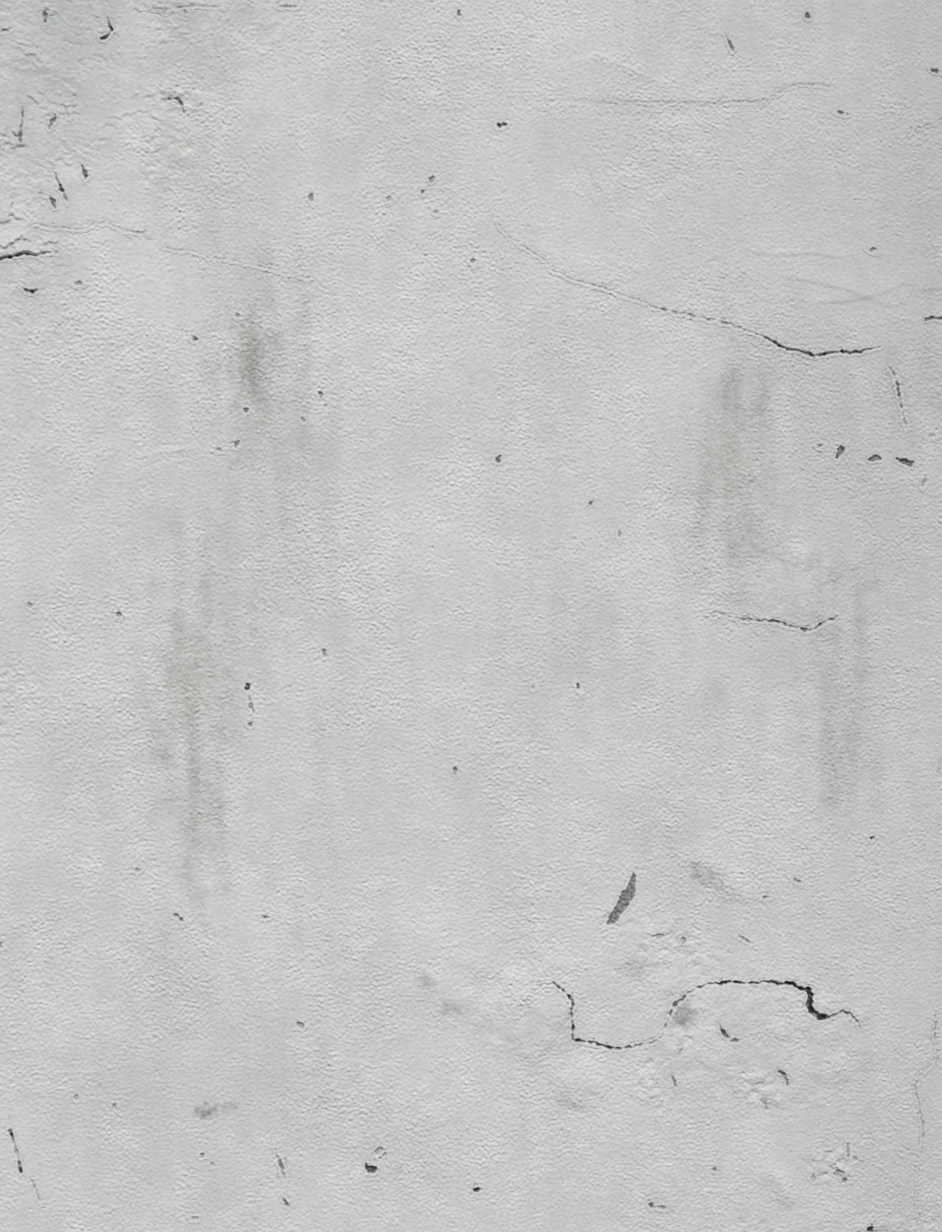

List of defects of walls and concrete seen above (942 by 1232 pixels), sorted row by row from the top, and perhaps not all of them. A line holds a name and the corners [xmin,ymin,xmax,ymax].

crack [0,25,15,36]
crack [0,218,313,283]
crack [494,219,912,433]
crack [923,312,942,324]
crack [702,608,841,635]
peeling [597,870,640,932]
crack [519,977,864,1091]